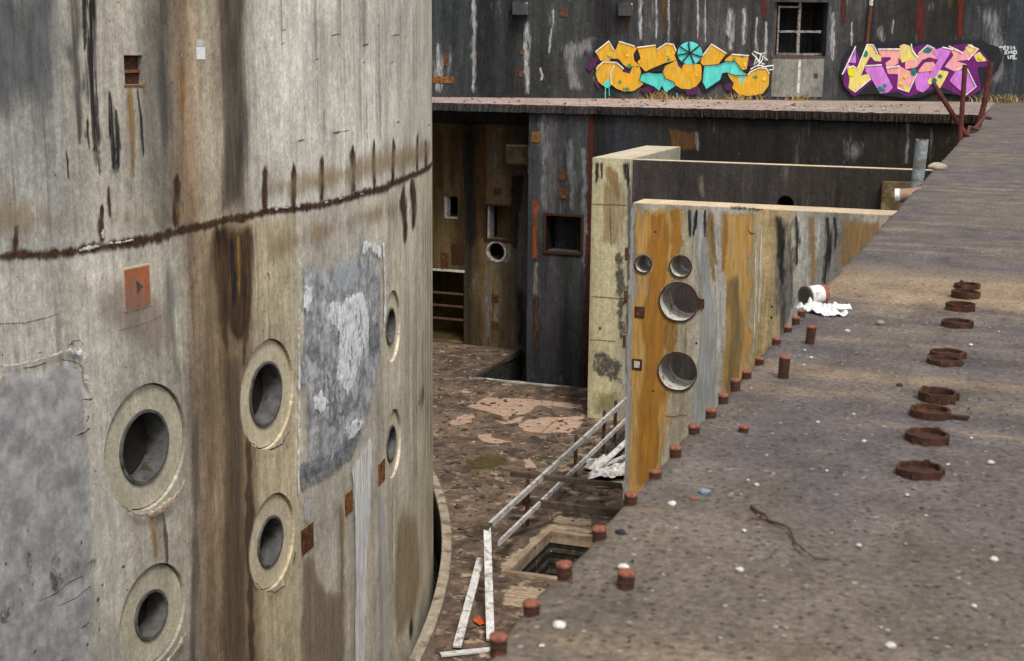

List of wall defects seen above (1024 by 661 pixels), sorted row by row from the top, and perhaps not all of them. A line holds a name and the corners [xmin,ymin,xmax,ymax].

damp [70,0,121,173]
rust [124,55,146,177]
rust [0,133,457,364]
peeling [297,240,387,495]
rust [708,213,753,394]
damp [753,226,762,352]
damp [775,216,801,334]
damp [815,217,837,284]
rust [841,220,879,267]
damp [220,357,255,661]
damp [190,521,199,661]